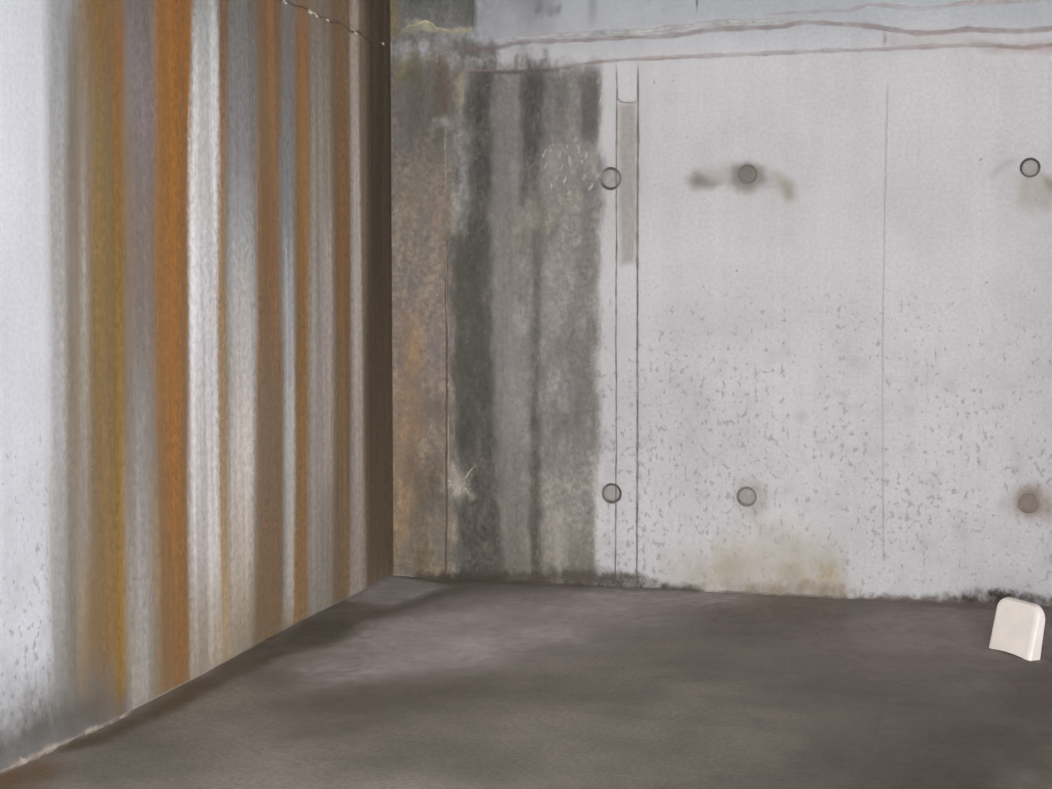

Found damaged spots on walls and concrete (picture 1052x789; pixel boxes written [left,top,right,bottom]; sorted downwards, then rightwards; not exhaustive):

rust [71,0,465,738]
water stain [390,0,700,592]